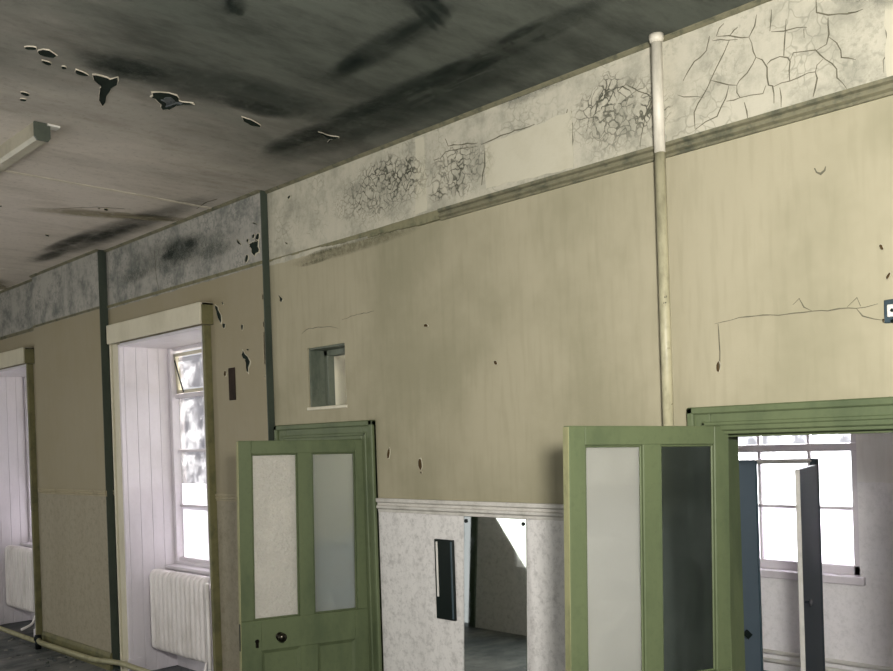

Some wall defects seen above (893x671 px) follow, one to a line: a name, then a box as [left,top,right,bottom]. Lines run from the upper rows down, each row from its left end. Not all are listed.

peeling [24,45,58,65]
crack [679,1,863,130]
crack [595,79,653,144]
crack [352,160,412,210]
crack [431,124,535,198]
leakage [62,210,177,221]
flaking render [236,222,260,263]
crack [715,297,880,369]
flaking render [241,349,251,374]